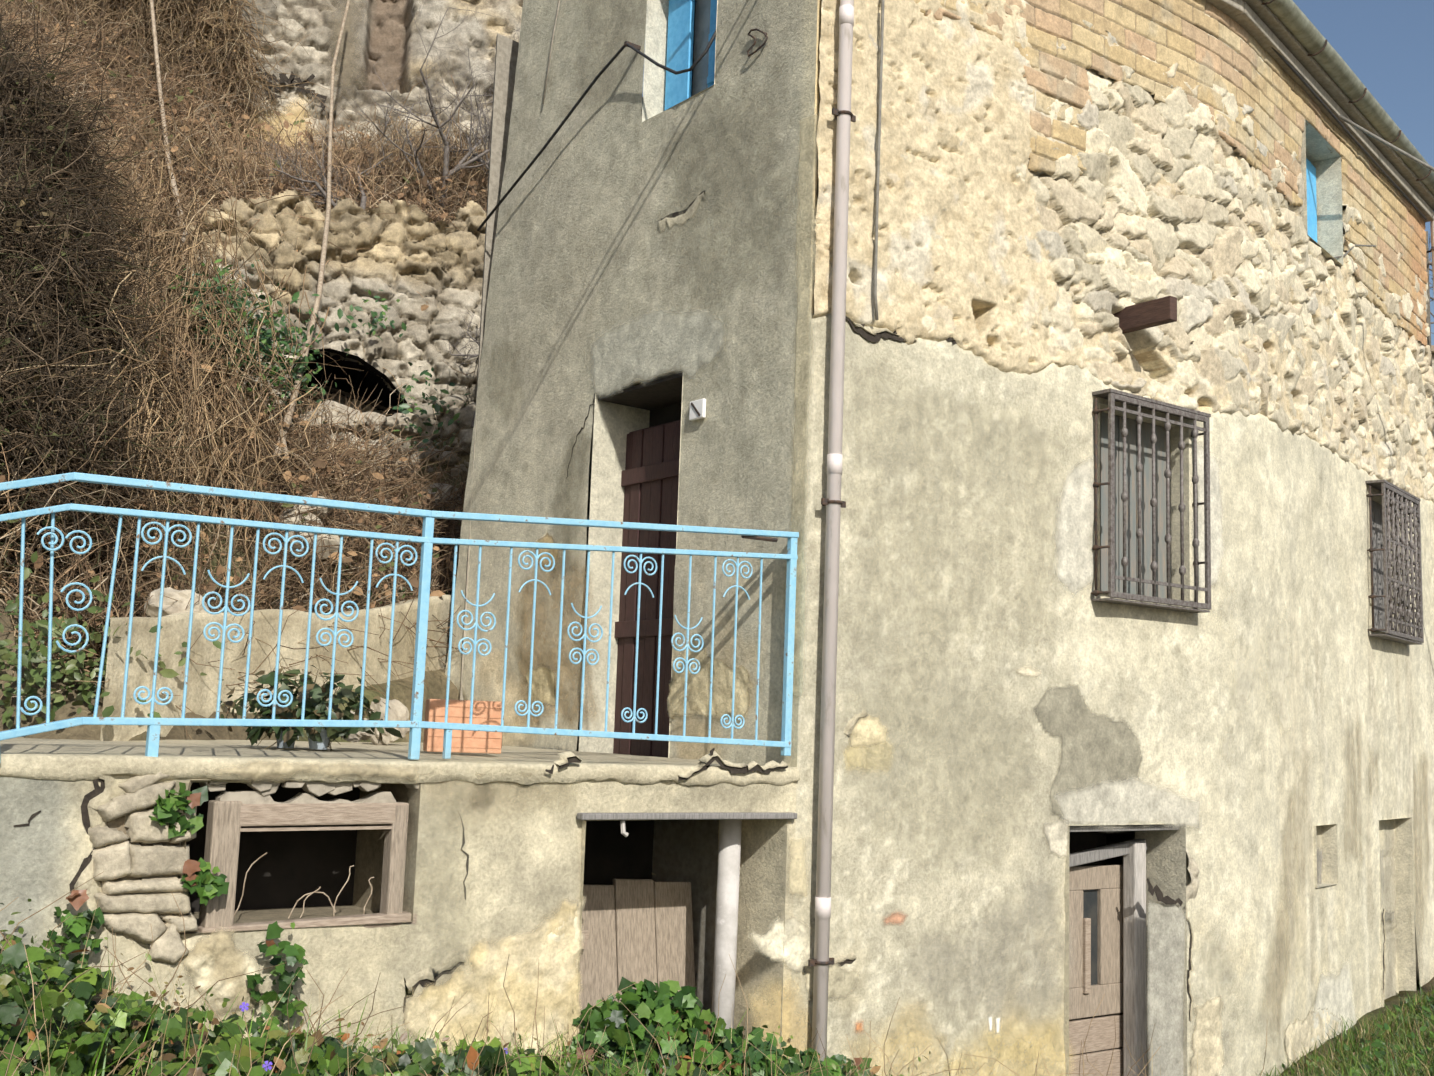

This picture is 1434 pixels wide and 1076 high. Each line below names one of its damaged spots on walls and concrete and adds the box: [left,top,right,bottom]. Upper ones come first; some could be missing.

spalling [851,716,887,746]
flaking render [88,762,419,1014]
peeling [405,901,584,1071]
crack [1184,906,1194,1021]